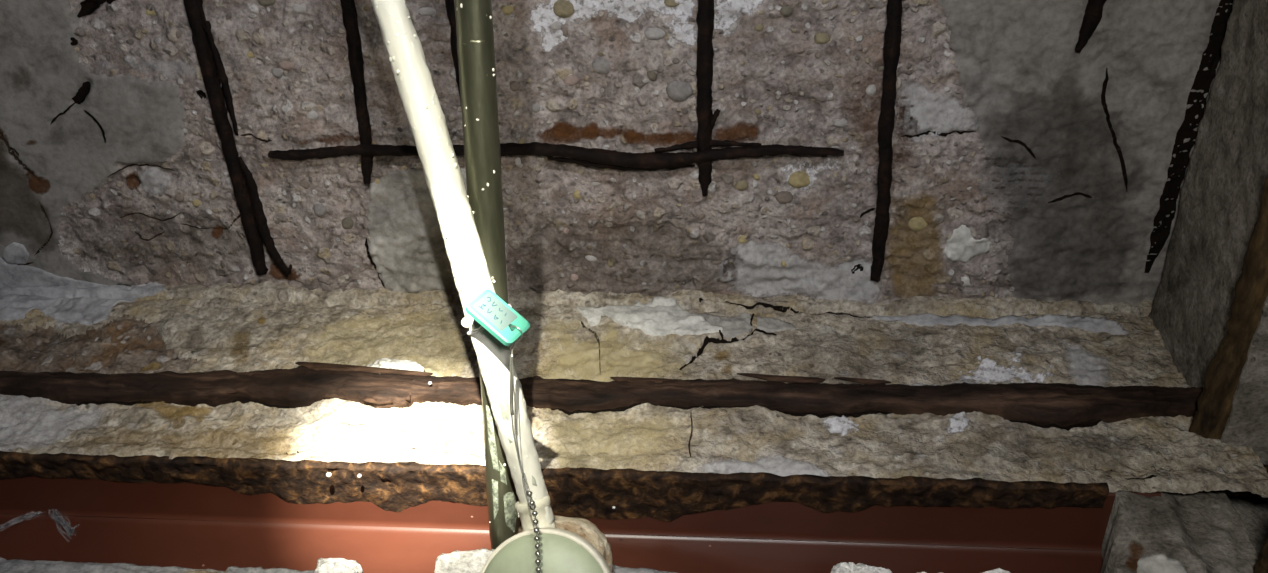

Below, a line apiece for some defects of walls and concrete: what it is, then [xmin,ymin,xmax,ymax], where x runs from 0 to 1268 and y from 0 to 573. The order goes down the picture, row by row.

damp [530,0,697,52]
damp [714,0,763,36]
crack [0,133,53,265]
spalling [0,0,467,374]
corrosion [538,109,762,171]
spalling [492,0,1128,339]
crack [679,298,898,370]
corrosion [295,362,433,376]
corrosion [715,351,891,385]